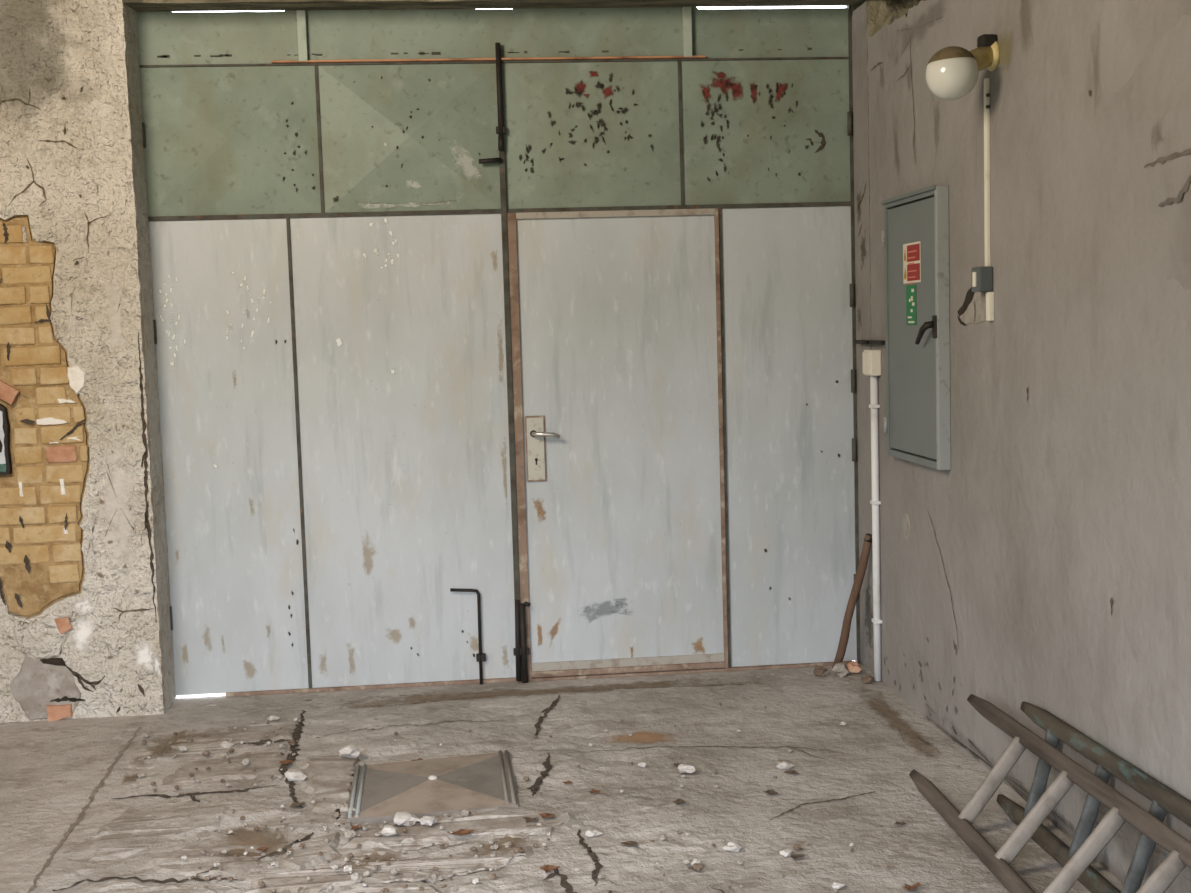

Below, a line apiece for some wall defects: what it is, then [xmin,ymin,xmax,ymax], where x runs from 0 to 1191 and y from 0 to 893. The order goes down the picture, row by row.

peeling [519,71,638,173]
peeling [701,72,798,182]
spalling [0,218,88,721]
crack [28,684,848,893]